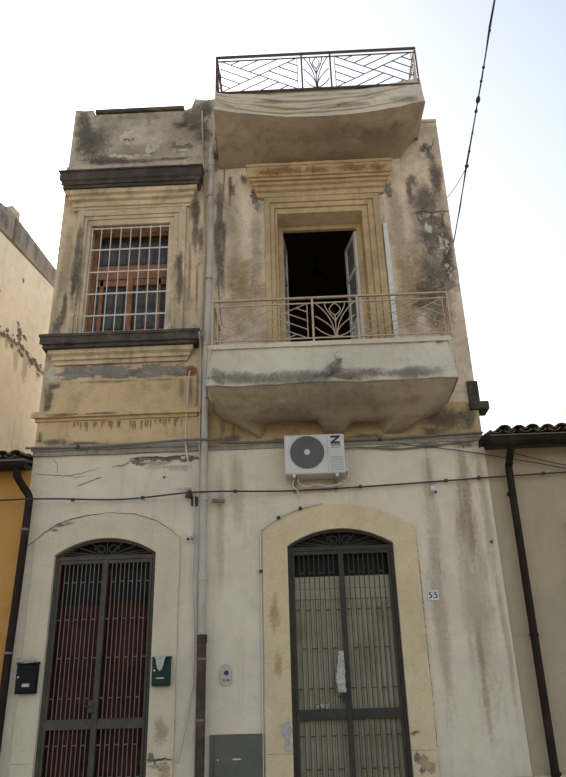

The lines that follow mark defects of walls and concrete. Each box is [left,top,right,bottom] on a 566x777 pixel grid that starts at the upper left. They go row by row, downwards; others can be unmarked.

damp [78,113,150,165]
damp [175,103,211,139]
damp [406,165,441,213]
flaking render [422,216,450,252]
damp [415,224,453,323]
flaking render [444,263,457,292]
flaking render [0,321,195,383]
damp [212,359,433,383]
crack [39,455,194,486]
flaking render [130,456,199,466]